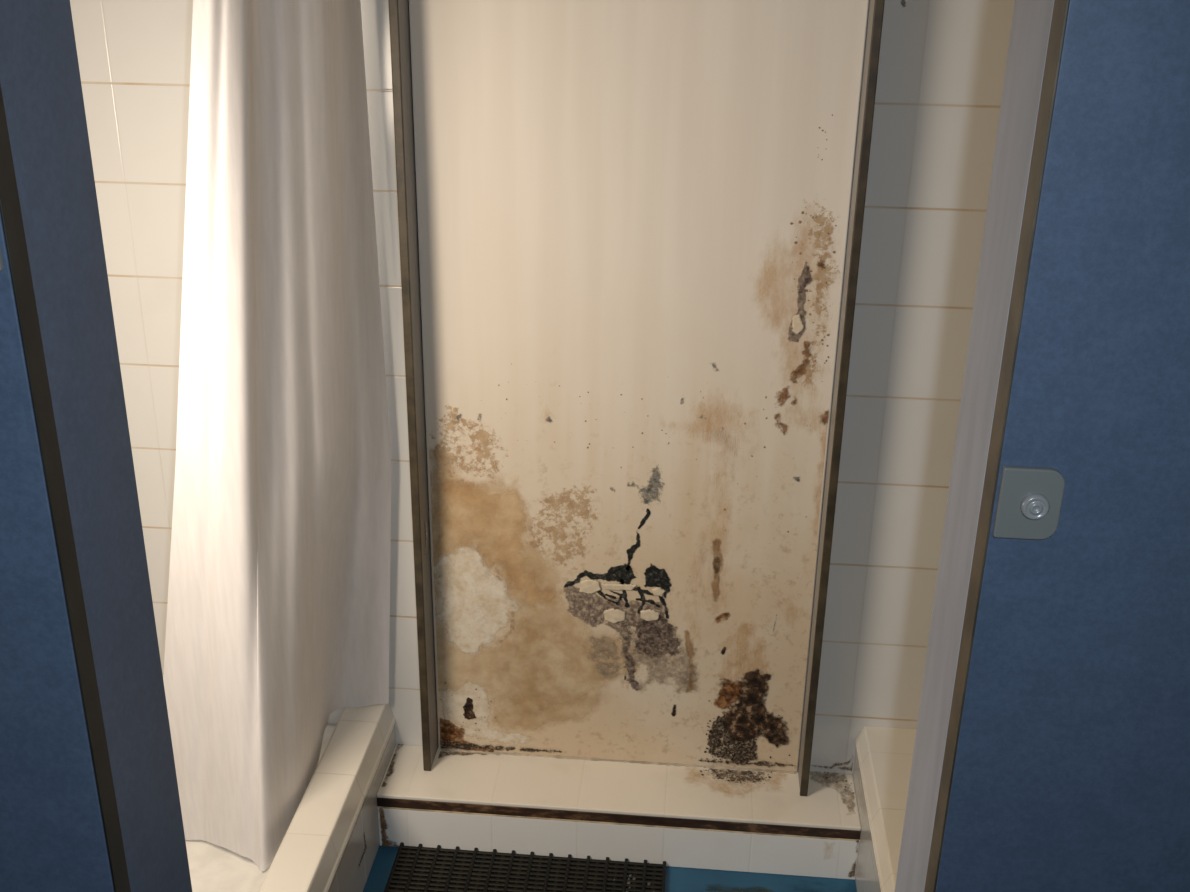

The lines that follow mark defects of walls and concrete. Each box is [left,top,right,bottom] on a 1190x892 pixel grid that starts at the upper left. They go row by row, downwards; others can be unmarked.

leakage [802,207,833,383]
leakage [430,406,697,729]
spalling [563,564,671,627]
crack [626,468,664,566]